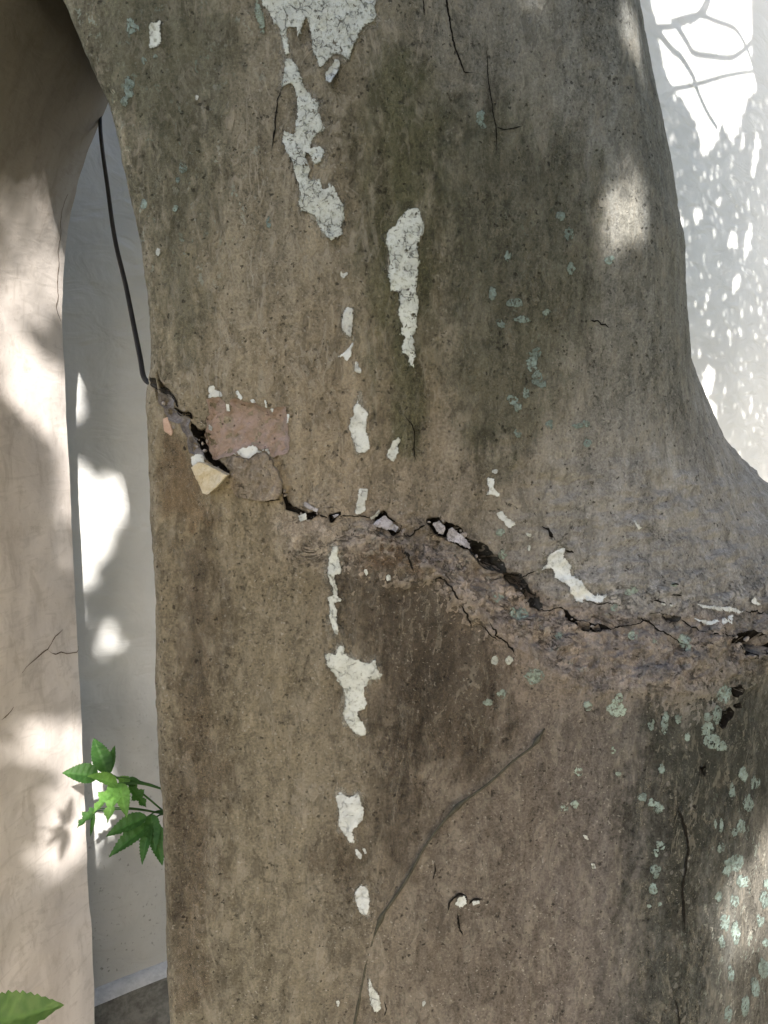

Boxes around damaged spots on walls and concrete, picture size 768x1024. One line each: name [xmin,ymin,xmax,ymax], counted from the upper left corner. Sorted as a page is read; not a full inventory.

peeling [254,0,380,241]
crack [423,0,521,150]
peeling [385,208,424,368]
crack [149,377,229,473]
spalling [204,386,290,460]
peeling [349,390,370,454]
peeling [324,543,382,737]
crack [265,488,768,660]
peeling [536,545,608,603]
peeling [335,787,367,859]
crack [447,893,482,935]
damp [622,669,768,1024]